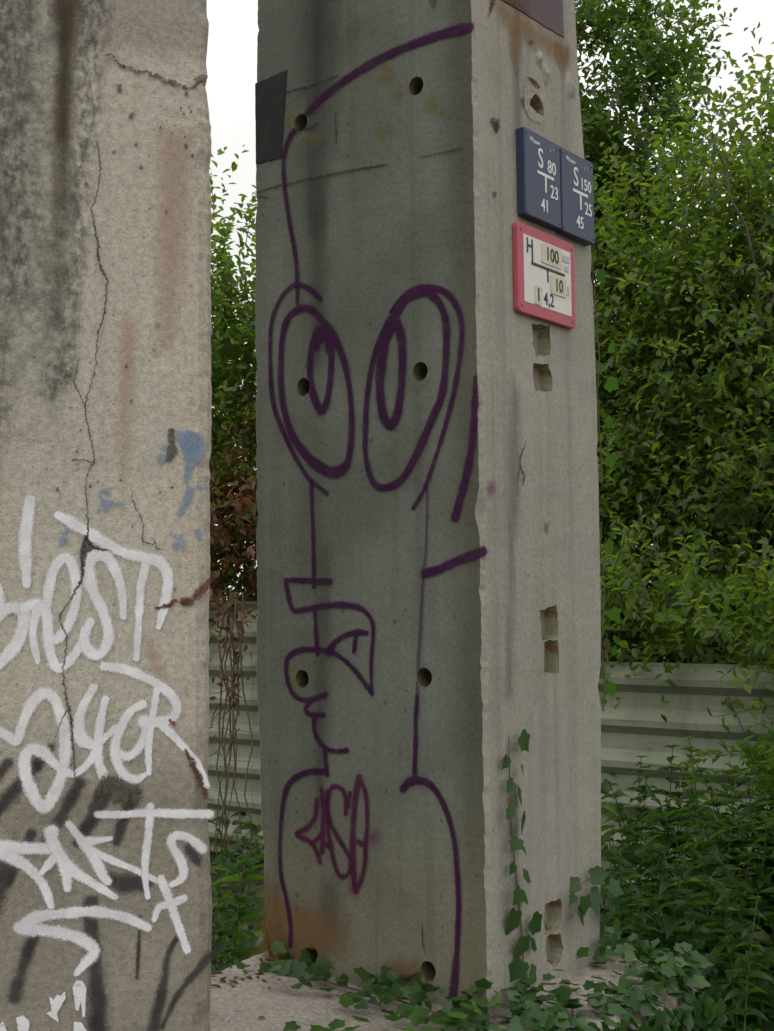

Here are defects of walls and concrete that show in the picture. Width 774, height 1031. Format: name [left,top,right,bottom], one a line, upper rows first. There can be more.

damp [58,0,78,198]
damp [0,45,29,297]
crack [52,142,113,799]
spalling [159,428,178,465]
crack [130,488,164,550]
rust [155,574,217,610]
rust [184,749,209,799]